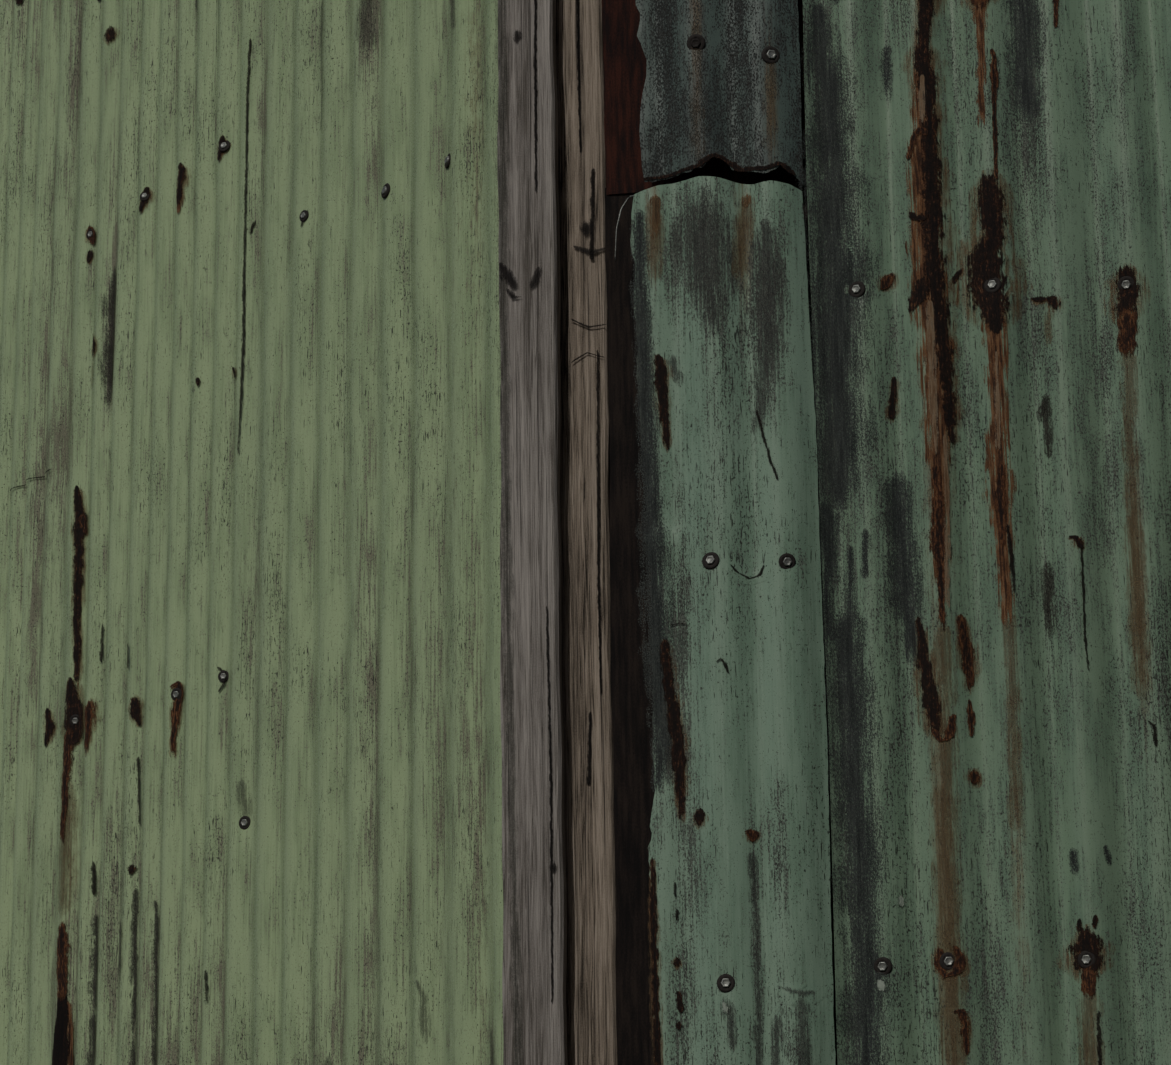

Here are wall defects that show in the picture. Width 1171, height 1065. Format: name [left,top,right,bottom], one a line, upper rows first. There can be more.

rust [653,354,683,449]
rust [905,0,1027,742]
rust [1104,265,1149,358]
rust [60,485,98,839]
rust [169,681,184,756]
rust [658,639,688,820]
rust [1060,914,1115,1065]